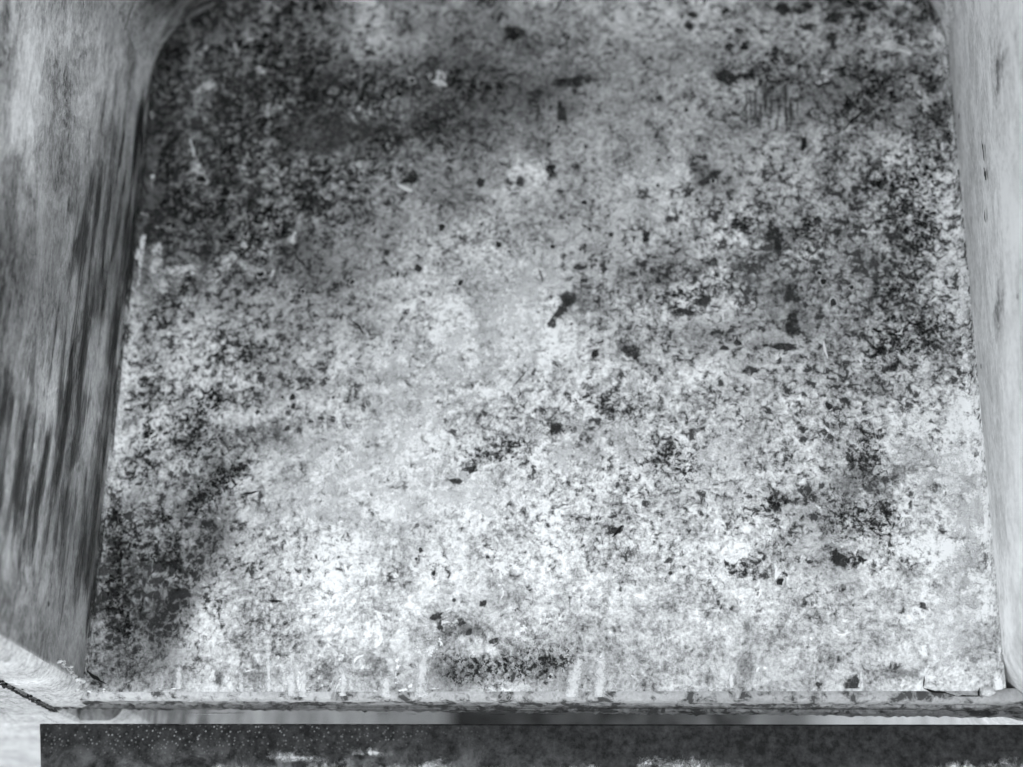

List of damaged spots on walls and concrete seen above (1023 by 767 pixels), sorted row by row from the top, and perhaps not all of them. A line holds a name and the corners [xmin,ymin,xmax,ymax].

leakage [552,69,597,88]
leakage [618,153,722,197]
leakage [710,0,972,400]
leakage [646,276,711,316]
leakage [0,0,589,658]
leakage [899,427,984,664]
leakage [237,657,271,692]
leakage [287,672,315,697]
leakage [844,671,863,688]